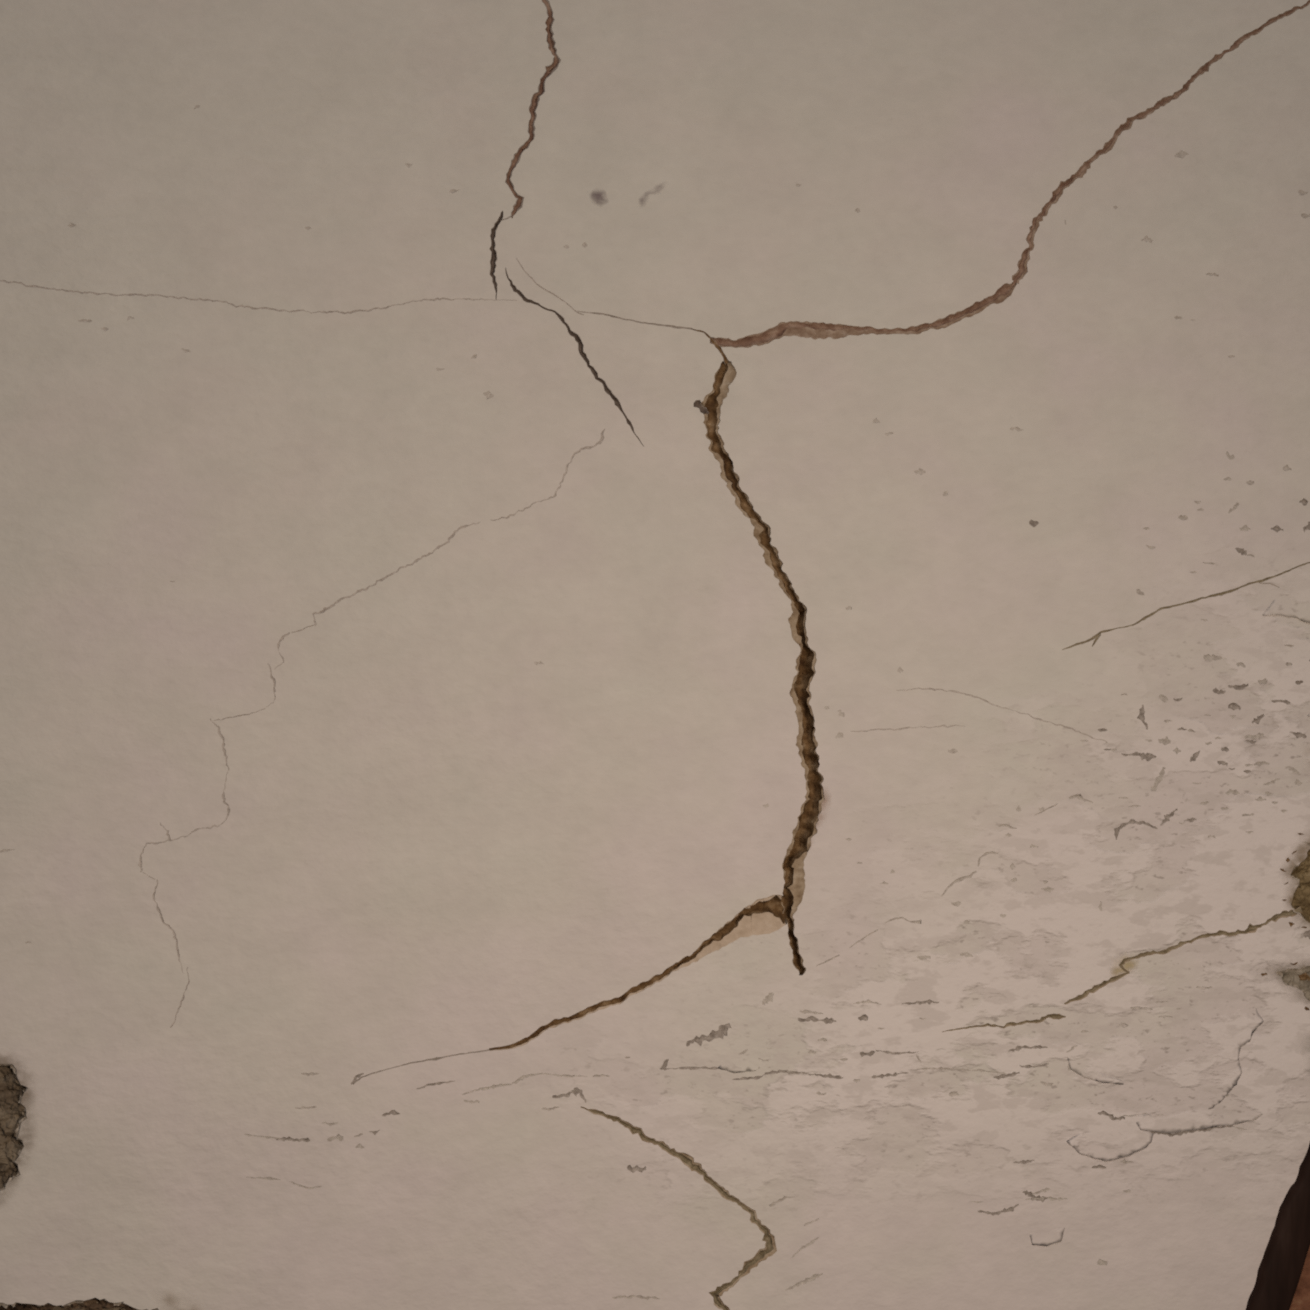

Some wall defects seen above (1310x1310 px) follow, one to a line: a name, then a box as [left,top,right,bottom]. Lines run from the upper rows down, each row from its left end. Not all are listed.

crack [0,0,643,445]
crack [352,0,1310,1085]
crack [138,429,605,1027]
flaking render [1261,962,1310,1010]
flaking render [1280,833,1310,939]
flaking render [0,1064,29,1191]
flaking render [0,1298,158,1310]
crack [580,1106,777,1310]